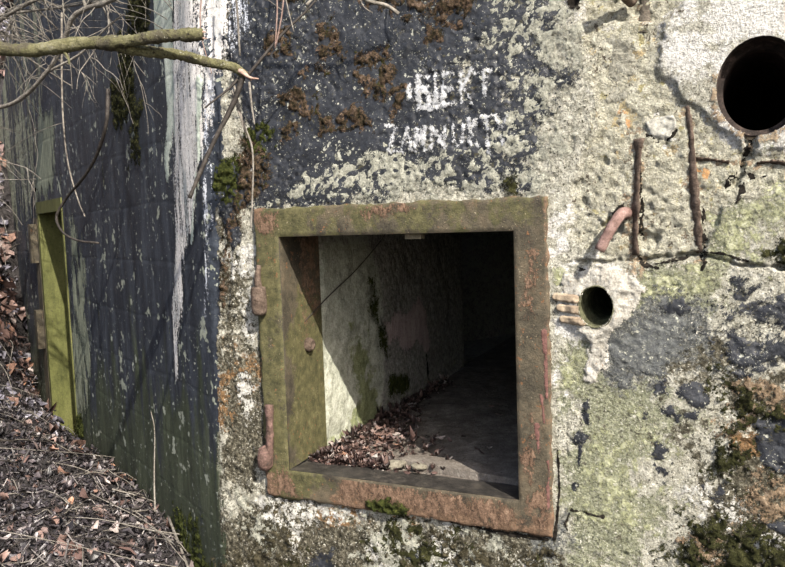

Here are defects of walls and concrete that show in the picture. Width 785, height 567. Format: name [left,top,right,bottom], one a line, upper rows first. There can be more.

spalling [561,0,785,267]
crack [724,138,767,204]
corrosion [254,210,279,246]
peeling [0,0,583,567]
peeling [604,267,785,423]
corrosion [267,466,303,499]
corrosion [337,411,550,530]
peeling [650,440,673,486]
peeling [673,472,750,533]
peeling [752,409,785,474]
peeling [753,518,785,563]